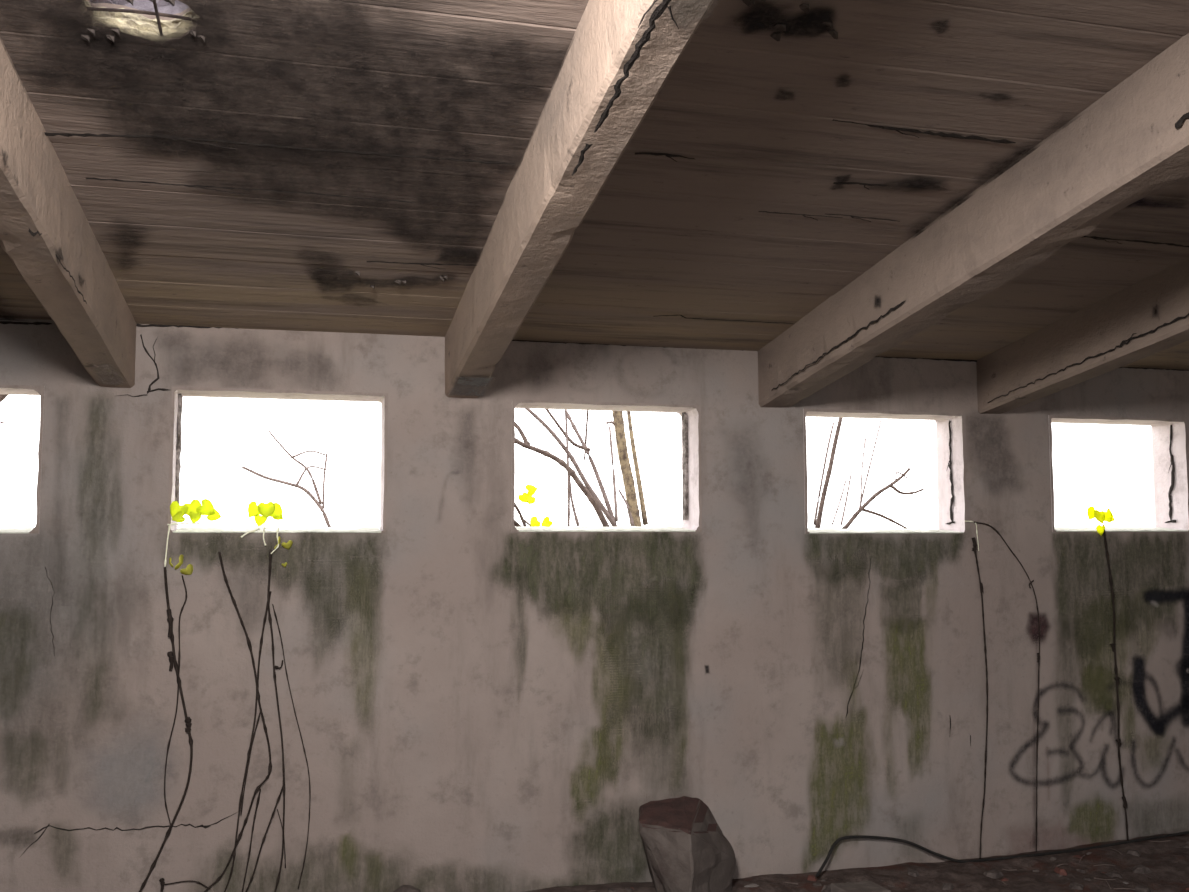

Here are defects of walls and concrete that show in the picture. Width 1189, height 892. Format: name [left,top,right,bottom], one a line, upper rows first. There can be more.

spalling [81,0,205,43]
leakage [0,0,564,263]
crack [572,0,679,176]
crack [1175,112,1189,129]
crack [771,301,905,391]
crack [988,313,1189,403]
leakage [563,594,687,777]
leakage [887,584,929,764]
leakage [574,811,647,886]
leakage [806,713,865,867]